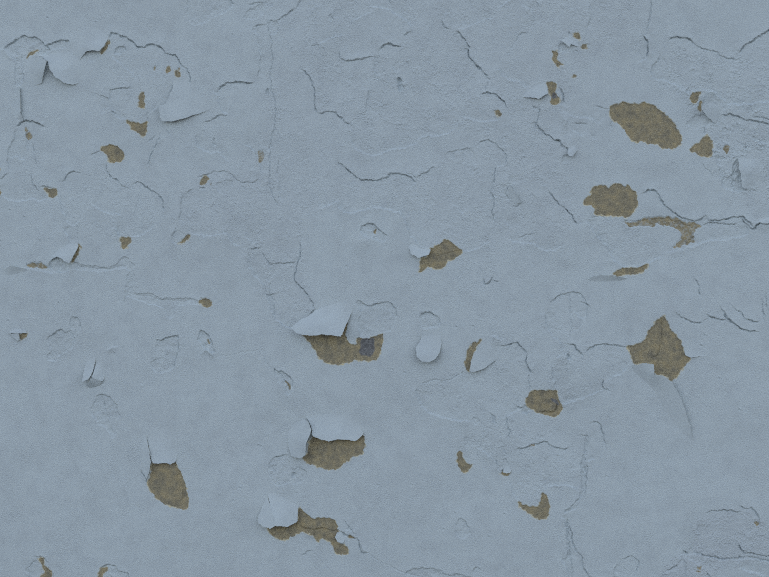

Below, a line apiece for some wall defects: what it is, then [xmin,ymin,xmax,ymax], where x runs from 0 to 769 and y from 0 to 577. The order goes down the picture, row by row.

crack [637,0,769,65]
peeling [0,24,269,275]
crack [336,161,437,186]
crack [534,122,579,291]
spalling [595,91,732,161]
crack [621,187,769,254]
crack [71,256,236,352]
peeling [291,301,384,367]
crack [673,277,769,335]
peeling [262,348,367,472]
spalling [514,314,705,440]
peeling [137,433,190,511]